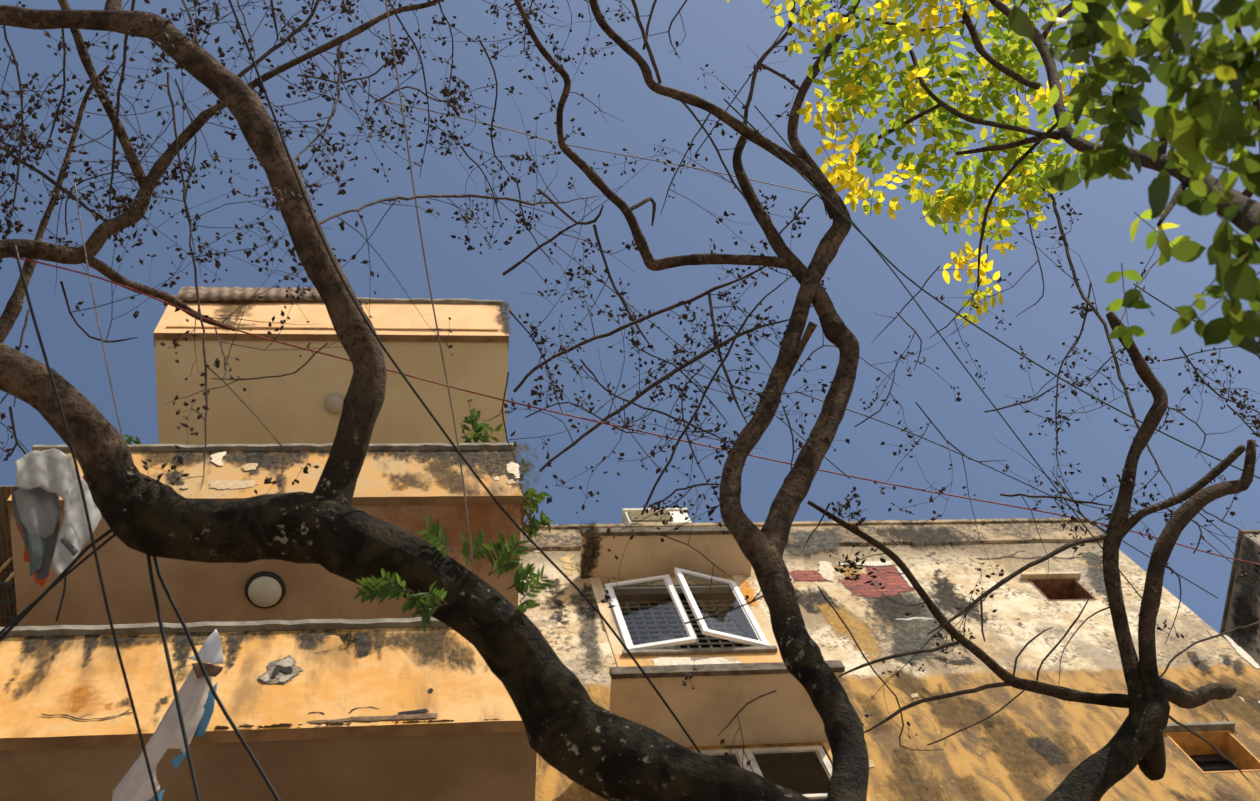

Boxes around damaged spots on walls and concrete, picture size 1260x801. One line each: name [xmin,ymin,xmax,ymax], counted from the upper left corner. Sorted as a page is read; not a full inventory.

peeling [209,451,259,490]
leakage [143,450,330,493]
leakage [787,528,841,555]
leakage [556,523,606,674]
flaking render [789,561,914,598]
leakage [1080,546,1109,605]
leakage [7,618,270,699]
flaking render [258,655,304,685]
leakage [286,627,475,671]
leakage [864,524,1090,801]
crack [42,708,133,720]
leakage [1172,788,1243,801]